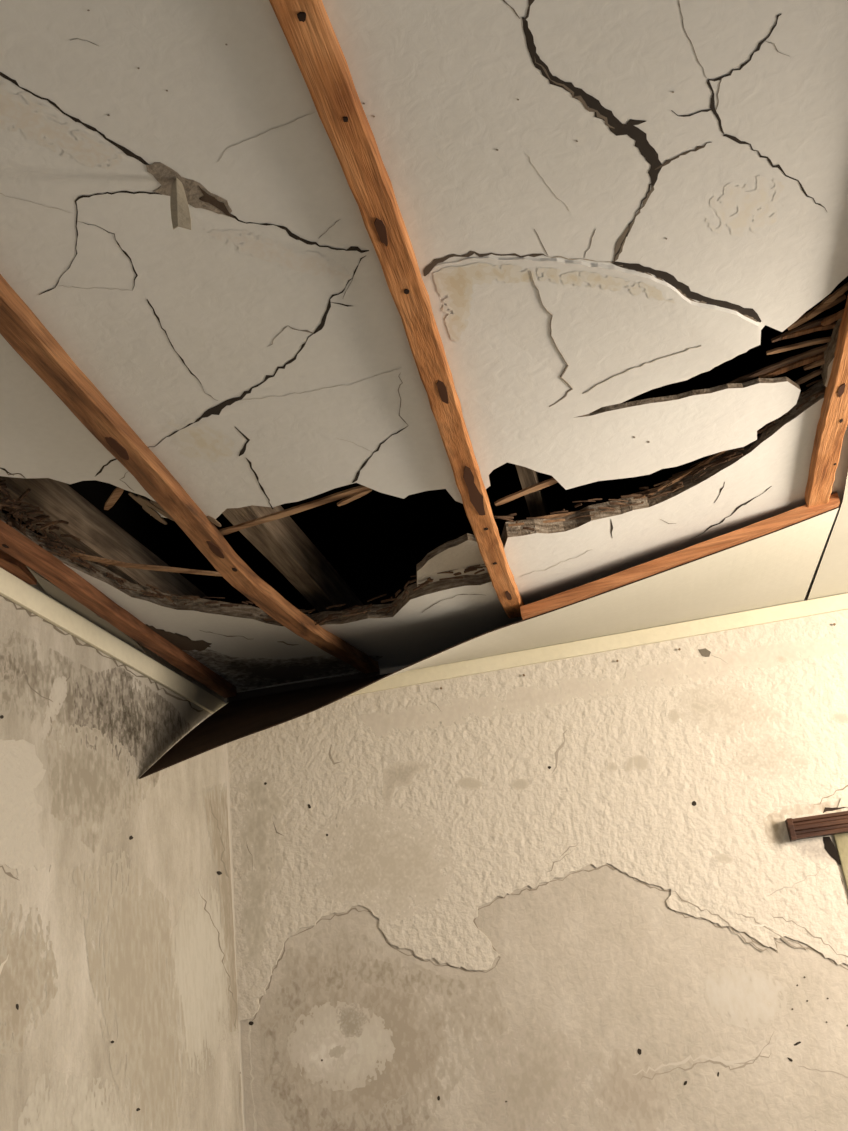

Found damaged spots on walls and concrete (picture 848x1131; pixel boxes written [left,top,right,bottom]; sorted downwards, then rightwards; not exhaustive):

crack [0,72,408,509]
crack [423,0,827,407]
leakage [0,622,192,1131]
flaking render [146,625,212,651]
leakage [305,804,454,921]
leakage [258,923,681,1131]
flaking render [217,609,848,1025]